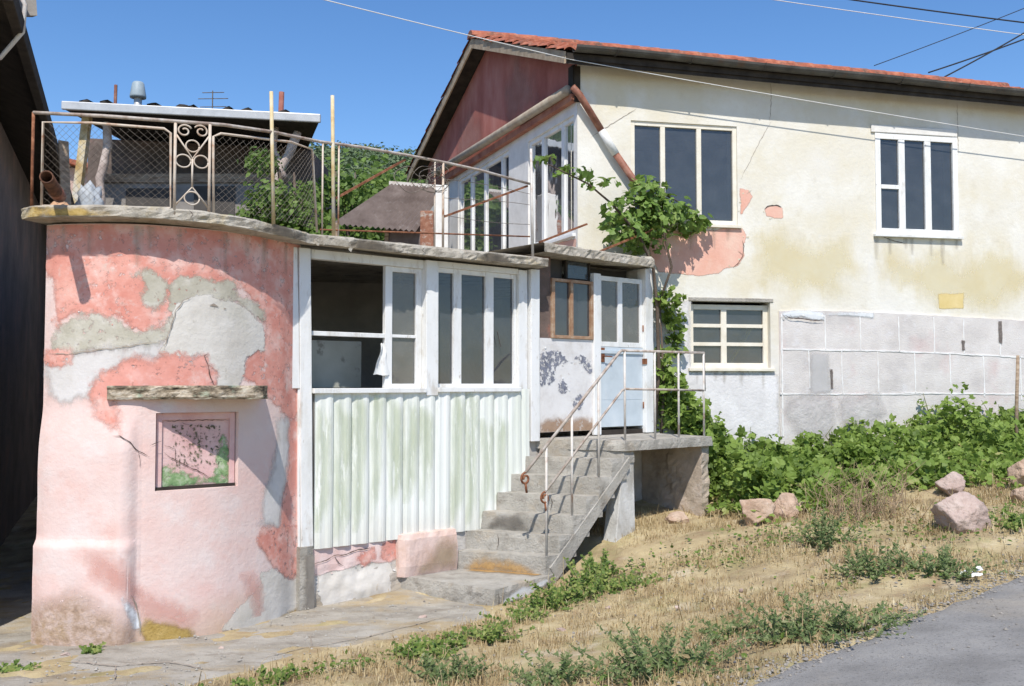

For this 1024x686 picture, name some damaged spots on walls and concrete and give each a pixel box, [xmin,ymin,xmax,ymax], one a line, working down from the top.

peeling [738,188,752,214]
flaking render [763,204,783,219]
peeling [649,227,749,276]
peeling [540,347,592,410]
crack [120,419,213,477]
peeling [44,224,300,631]
flaking render [313,538,396,606]